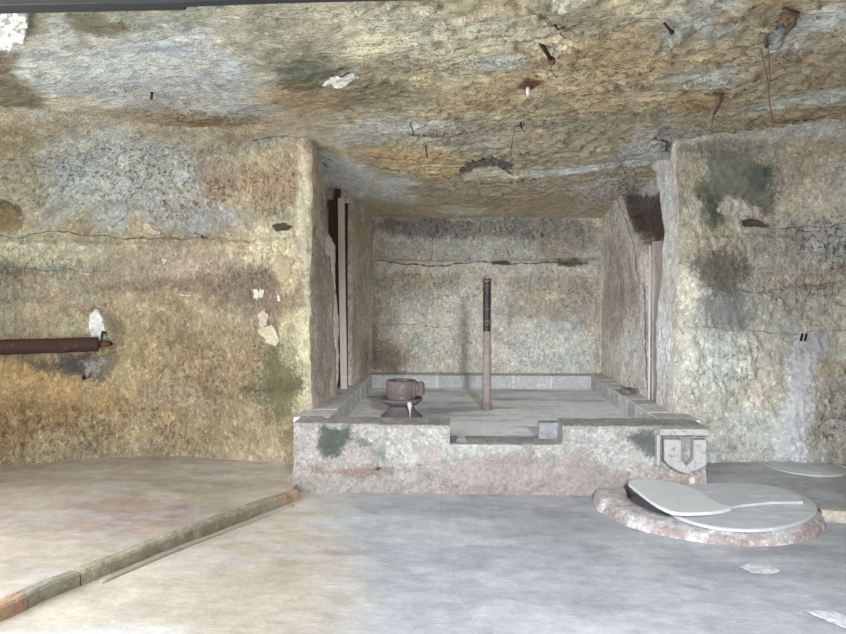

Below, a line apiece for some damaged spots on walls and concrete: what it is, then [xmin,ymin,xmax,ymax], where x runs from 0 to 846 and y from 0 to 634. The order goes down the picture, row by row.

damp [276,73,360,95]
spalling [459,157,513,182]
damp [698,186,727,231]
crack [0,210,231,241]
crack [768,223,846,232]
crack [375,233,590,267]
peeling [257,172,339,386]
spalling [804,610,846,628]